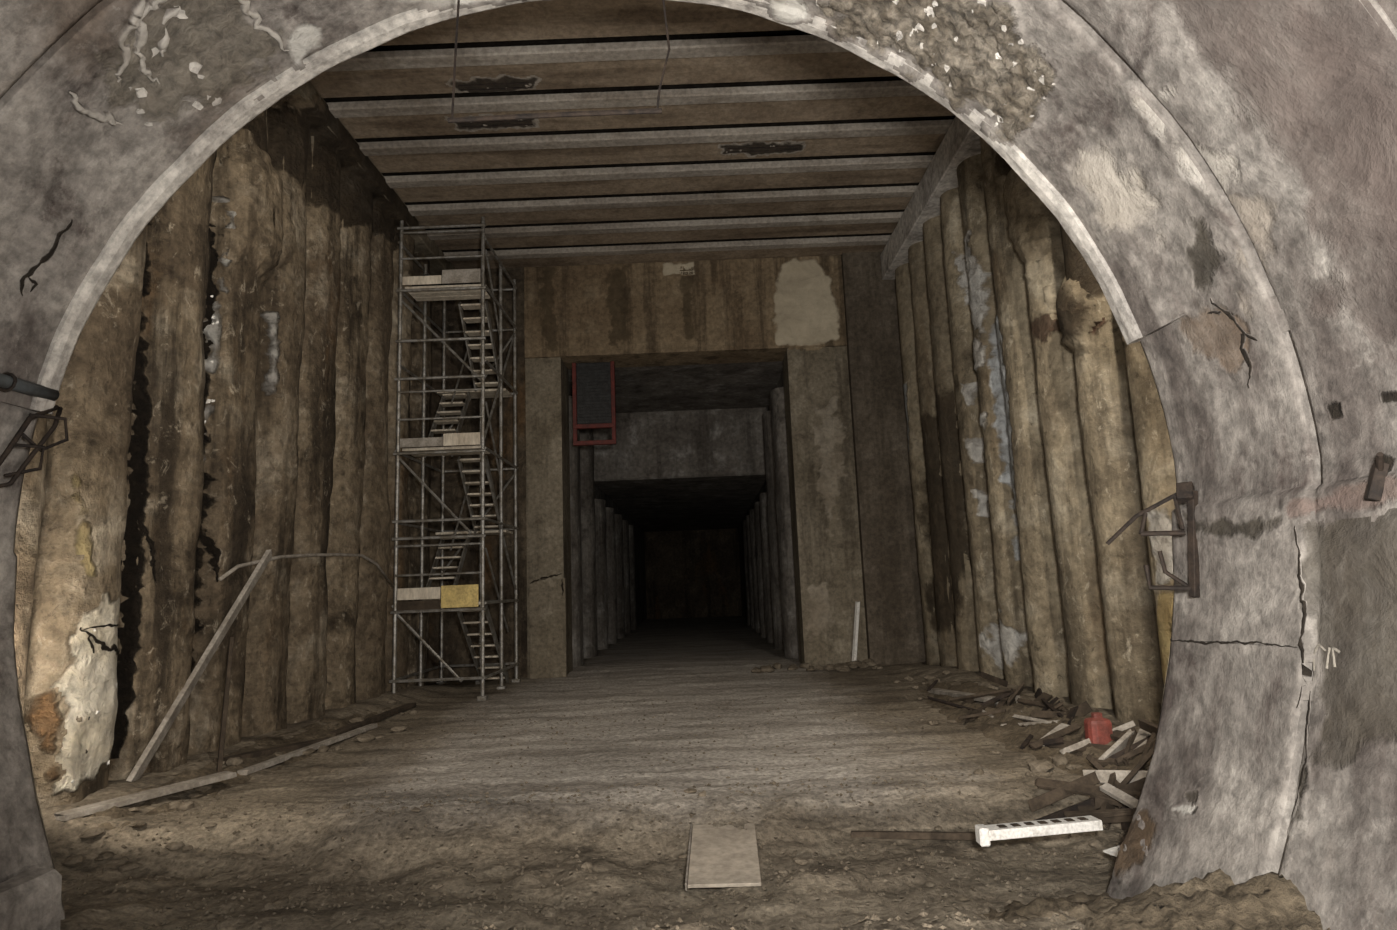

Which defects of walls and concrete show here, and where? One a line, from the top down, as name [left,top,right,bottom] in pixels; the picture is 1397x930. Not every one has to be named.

damp [283,18,328,71]
spalling [744,0,1063,148]
crack [19,219,73,296]
crack [1207,298,1257,388]
crack [1170,526,1313,822]